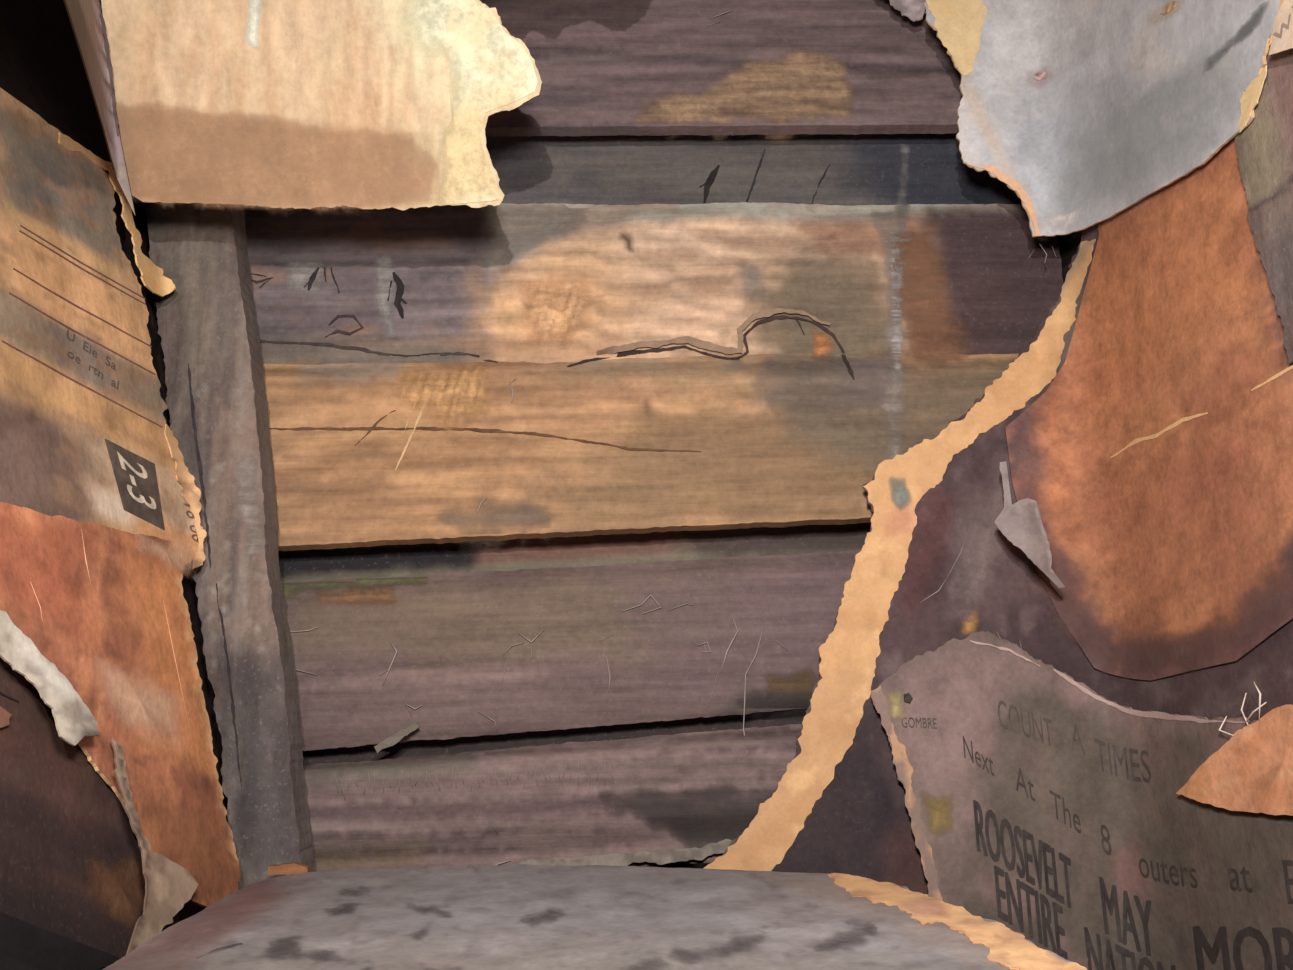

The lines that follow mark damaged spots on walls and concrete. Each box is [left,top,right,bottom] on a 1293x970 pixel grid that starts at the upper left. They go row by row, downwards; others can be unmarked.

peeling [409,0,537,205]
crack [699,165,720,204]
crack [746,149,765,202]
crack [812,164,830,204]
crack [567,315,854,380]
crack [270,410,701,452]